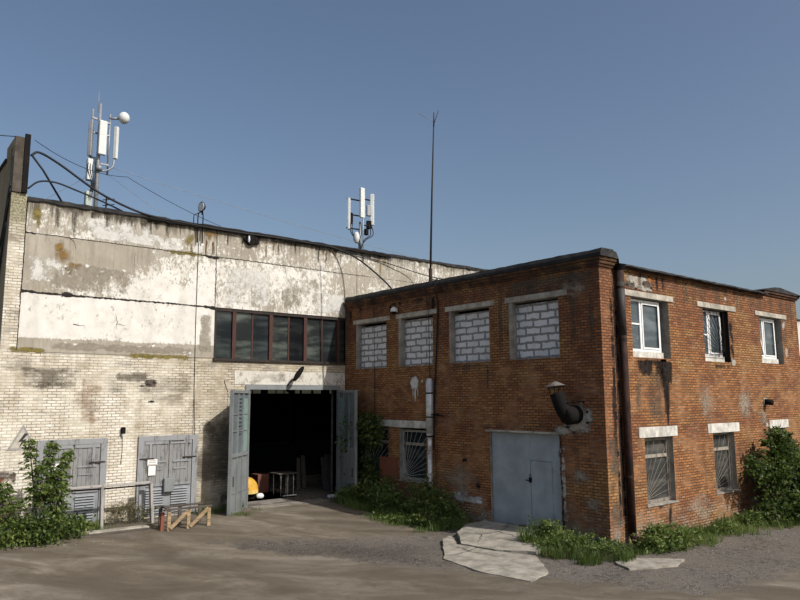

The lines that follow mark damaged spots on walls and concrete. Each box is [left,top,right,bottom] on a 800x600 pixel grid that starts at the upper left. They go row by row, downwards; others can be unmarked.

leakage [68,207,170,232]
peeling [87,218,204,254]
peeling [29,256,126,299]
spalling [624,275,653,292]
leakage [118,373,146,381]
leakage [639,360,672,425]
spalling [555,402,592,435]
leakage [610,335,626,523]